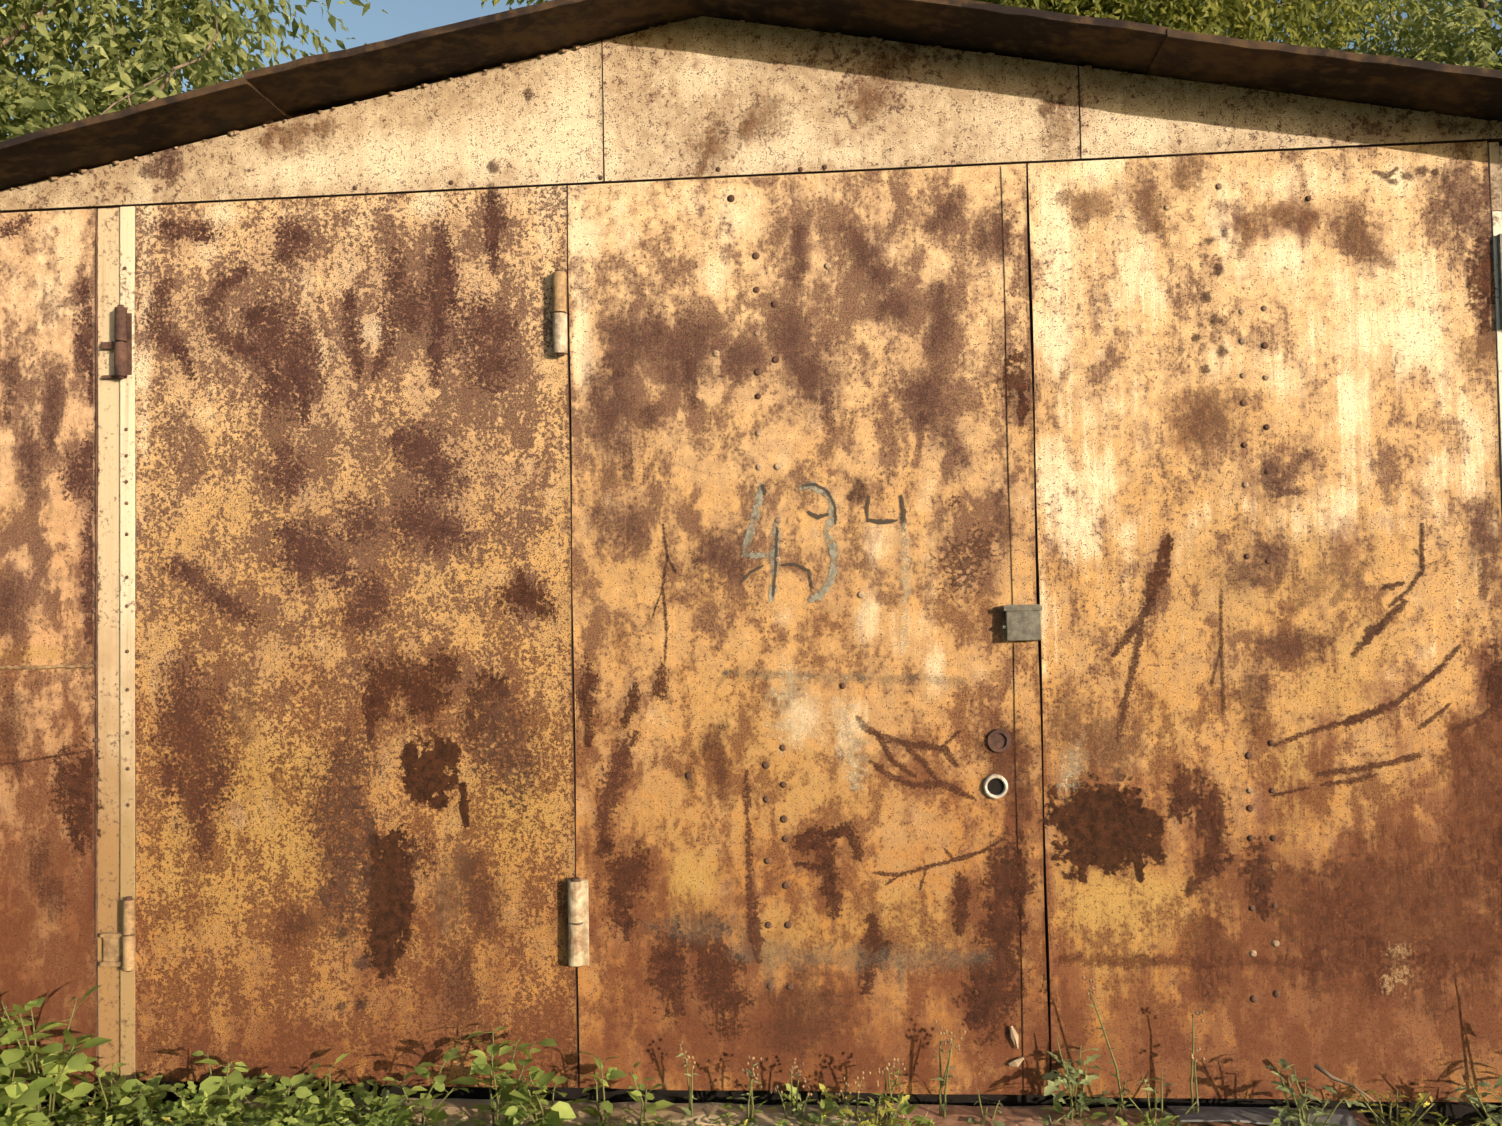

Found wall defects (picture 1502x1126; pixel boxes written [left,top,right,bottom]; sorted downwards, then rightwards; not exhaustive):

rust [1373,164,1502,371]
rust [0,276,102,644]
rust [30,732,104,922]
rust [150,644,256,865]
rust [142,161,522,751]
rust [494,567,562,624]
rust [570,652,600,748]
rust [591,663,893,1055]
rust [930,487,1013,603]
rust [950,721,1042,1052]
rust [997,348,1038,428]
rust [1163,760,1278,1014]